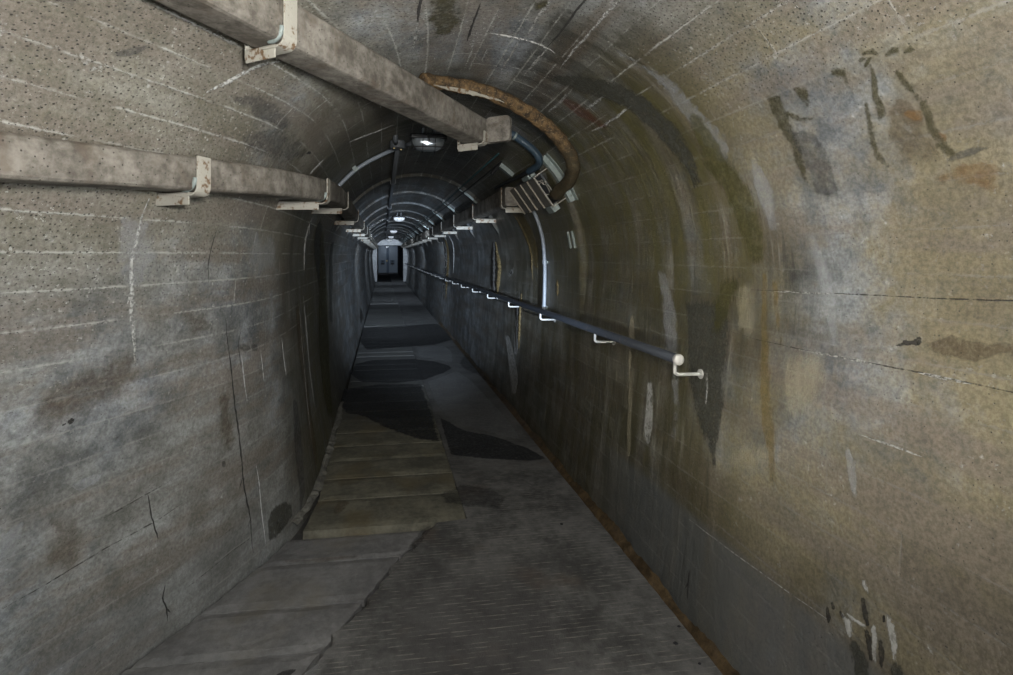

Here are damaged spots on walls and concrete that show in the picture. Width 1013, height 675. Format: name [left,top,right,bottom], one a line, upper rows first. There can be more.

water stain [428,0,460,35]
water stain [769,96,810,179]
water stain [794,88,809,106]
water stain [859,46,914,161]
water stain [920,101,955,156]
crack [225,319,254,553]
crack [148,496,158,538]
crack [162,587,170,622]